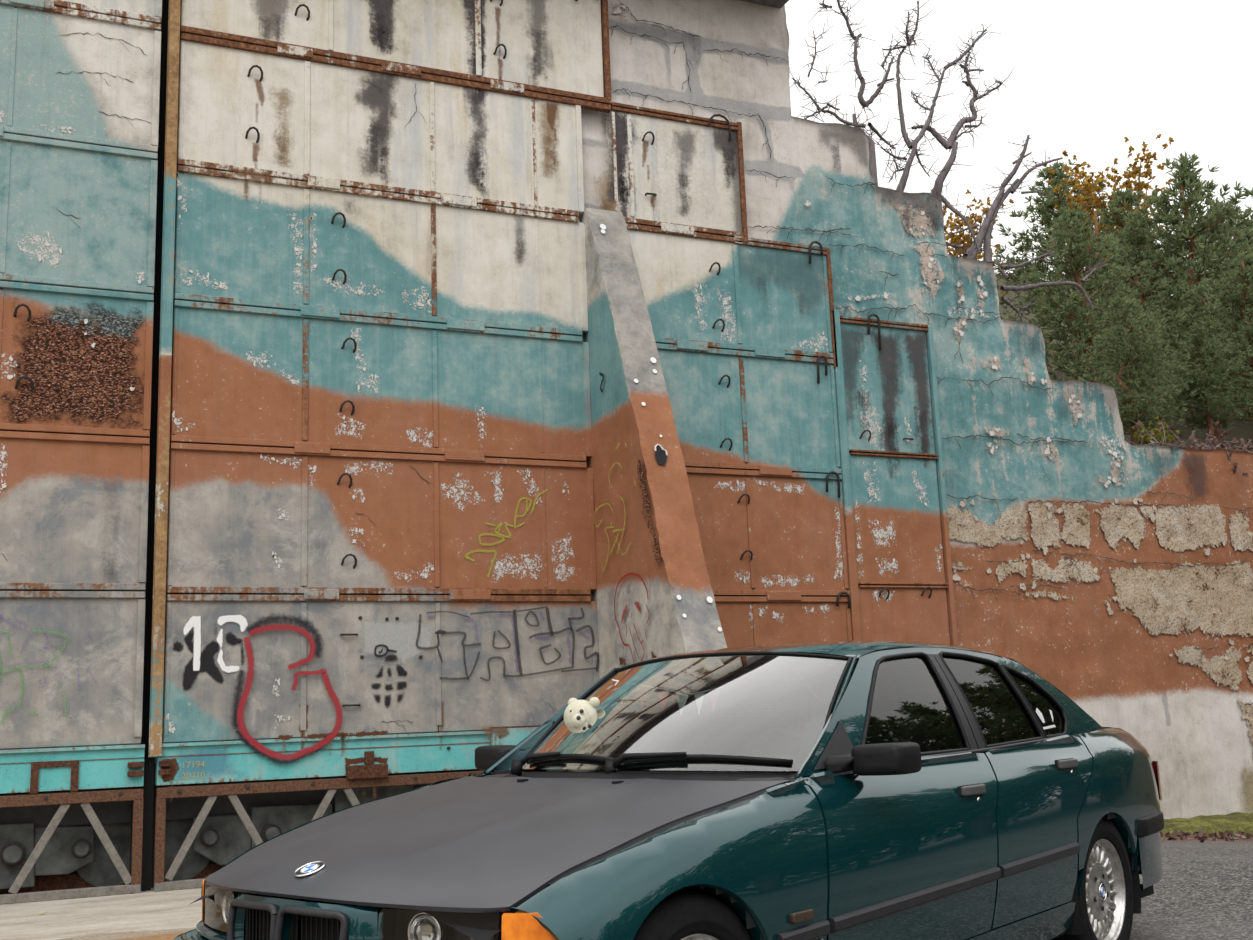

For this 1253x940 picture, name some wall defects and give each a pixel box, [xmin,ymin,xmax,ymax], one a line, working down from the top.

crack [57,32,150,130]
rust [232,144,271,198]
leakage [356,73,394,179]
leakage [369,0,393,51]
leakage [464,0,487,192]
crack [610,1,796,187]
crack [826,176,878,196]
crack [748,226,1051,399]
peeling [894,201,997,341]
leakage [874,333,932,466]
peeling [911,468,929,506]
peeling [936,434,1253,746]